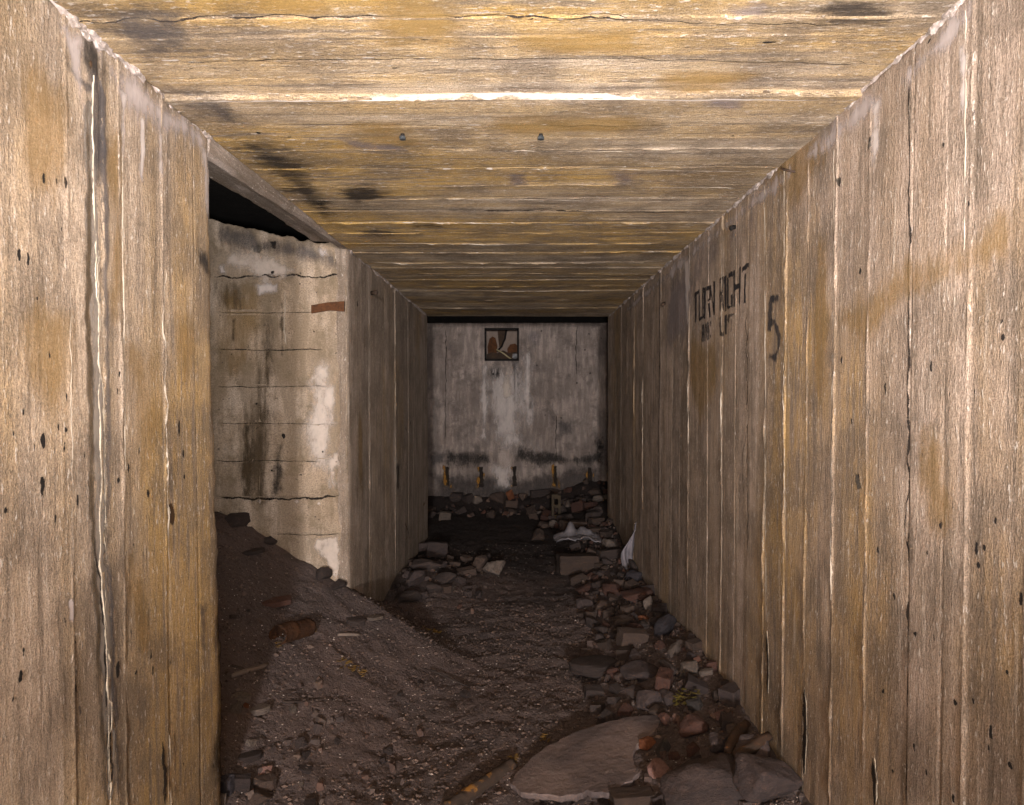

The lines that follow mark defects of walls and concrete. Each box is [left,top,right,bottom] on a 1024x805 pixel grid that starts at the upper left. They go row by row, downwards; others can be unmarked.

leakage [238,144,330,215]
leakage [342,188,386,202]
crack [218,272,337,280]
leakage [242,351,282,499]
leakage [433,353,603,497]
crack [219,495,338,505]